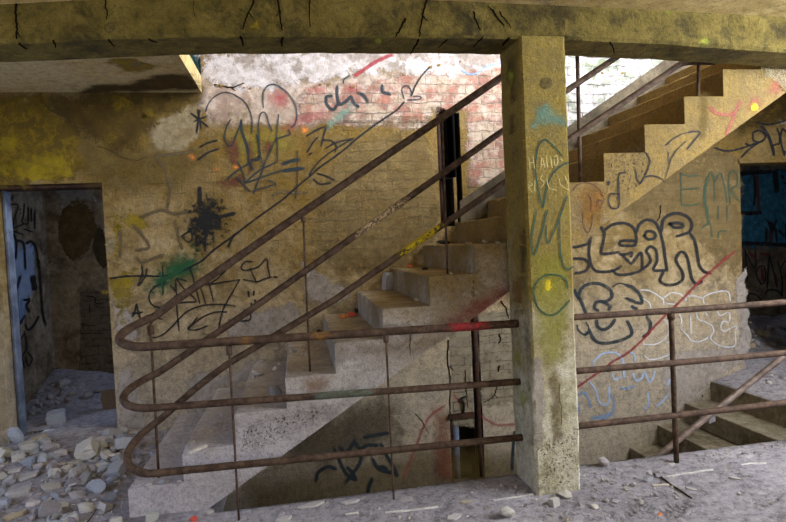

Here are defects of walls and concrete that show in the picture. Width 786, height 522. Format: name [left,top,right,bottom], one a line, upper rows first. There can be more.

crack [14,3,27,49]
crack [239,0,255,46]
crack [276,0,284,47]
crack [395,0,428,54]
crack [472,6,511,48]
leakage [48,55,204,151]
spalling [196,53,504,273]
spalling [0,135,147,429]